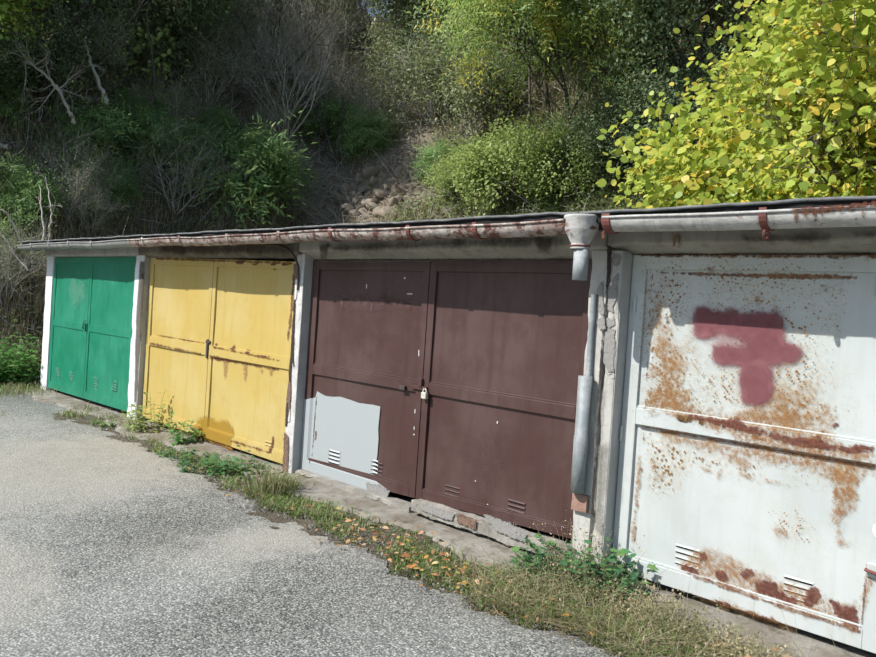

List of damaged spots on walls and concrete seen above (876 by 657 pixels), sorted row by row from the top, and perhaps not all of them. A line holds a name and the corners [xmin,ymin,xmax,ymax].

corrosion [790,201,876,223]
corrosion [150,335,279,378]
corrosion [632,235,876,543]
corrosion [154,422,274,454]
spalling [420,504,527,542]
corrosion [681,550,871,632]